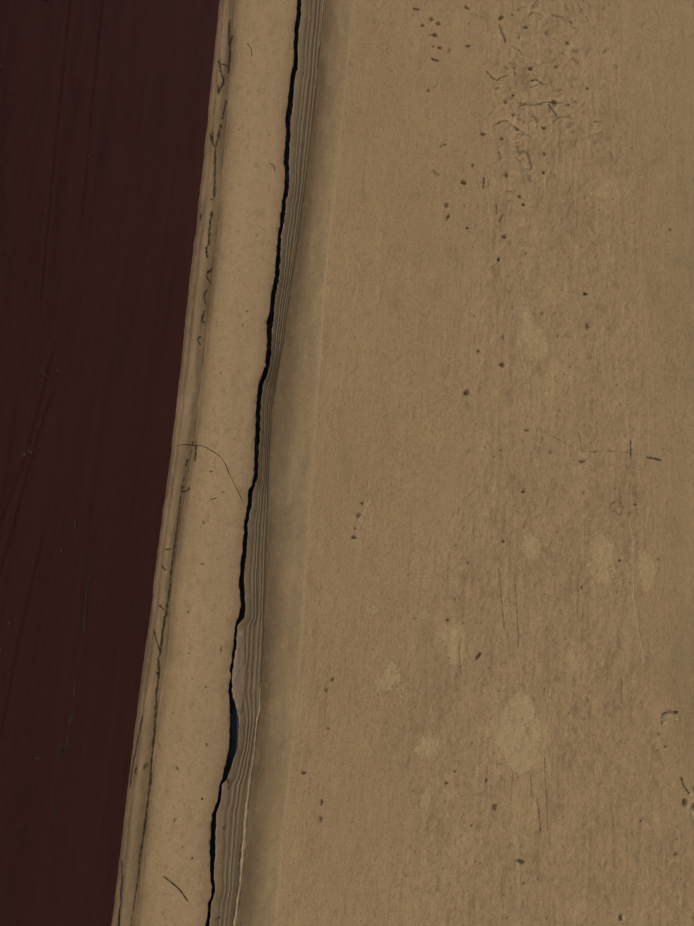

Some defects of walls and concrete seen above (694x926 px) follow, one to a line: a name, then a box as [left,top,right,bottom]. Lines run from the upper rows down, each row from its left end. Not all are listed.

crack [197,22,233,345]
crack [206,0,301,926]